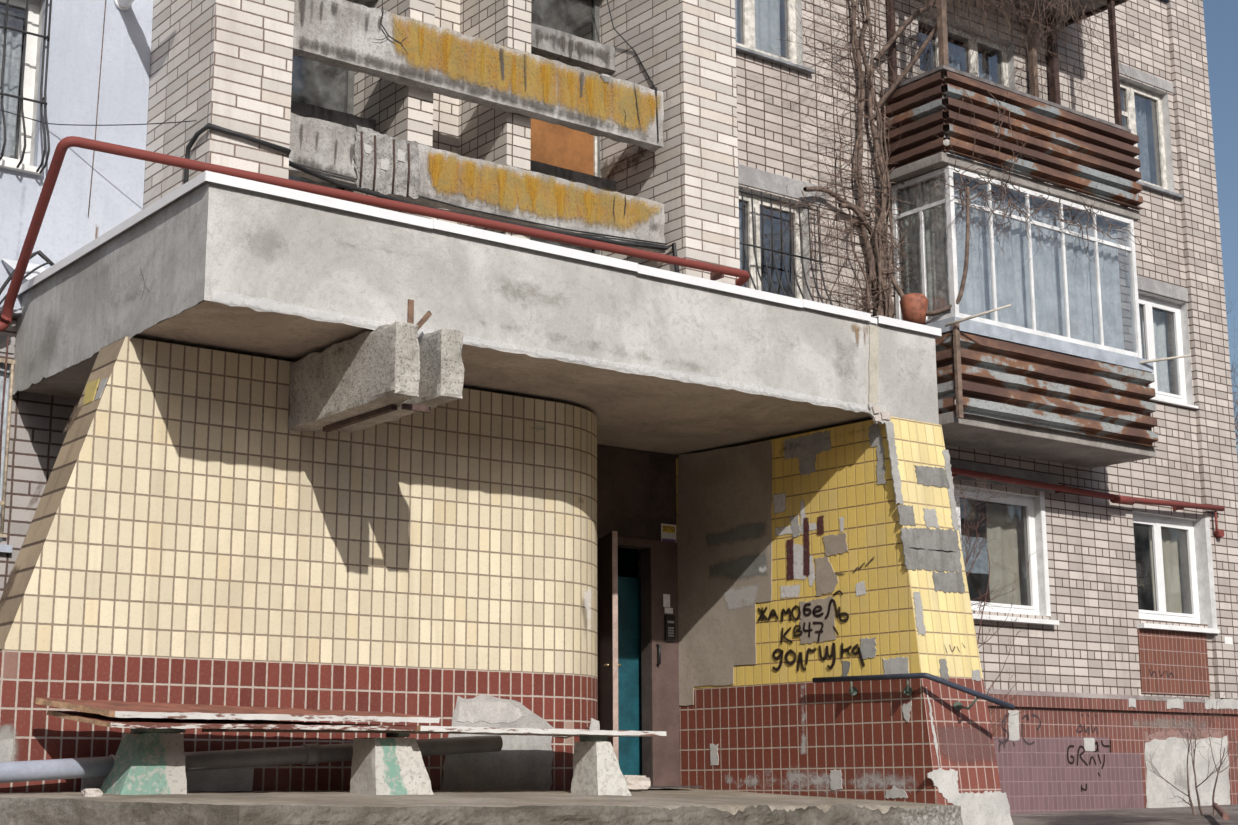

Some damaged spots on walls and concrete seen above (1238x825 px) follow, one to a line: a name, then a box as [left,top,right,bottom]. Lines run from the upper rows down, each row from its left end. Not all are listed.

spalling [354,125,421,199]
peeling [867,402,904,504]
peeling [900,449,965,636]
peeling [842,637,877,676]
peeling [939,659,950,680]